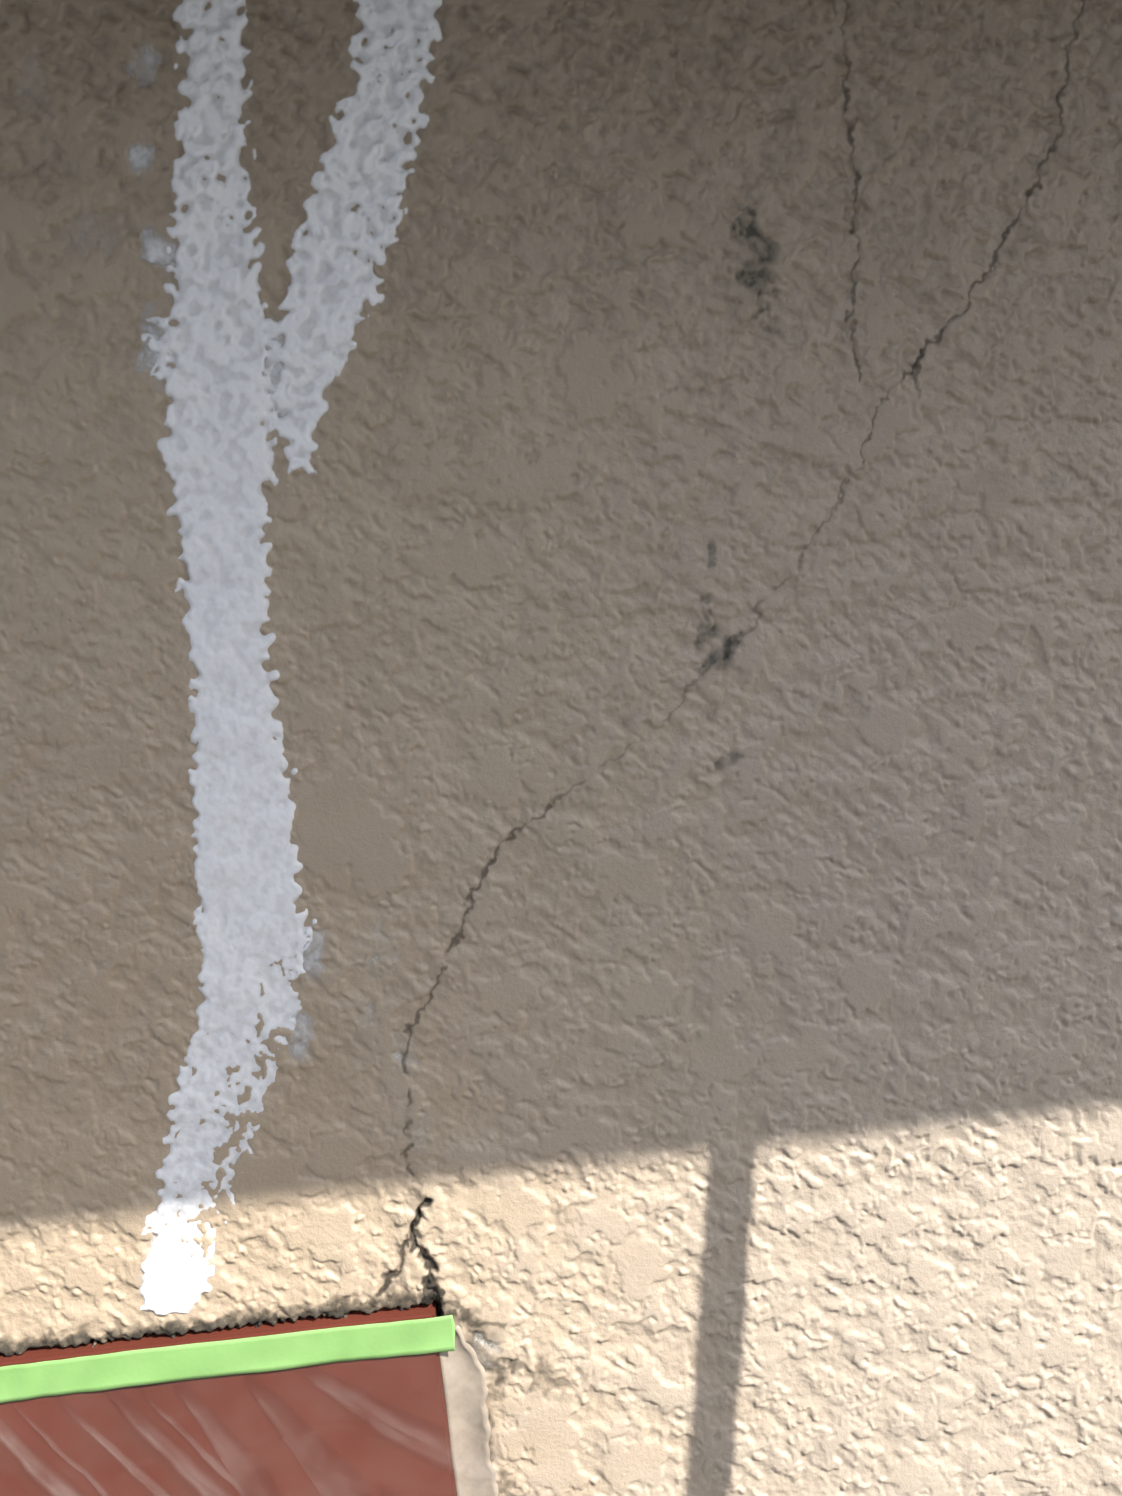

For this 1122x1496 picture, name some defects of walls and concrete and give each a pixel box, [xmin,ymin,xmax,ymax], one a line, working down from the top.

crack [376,1199,459,1308]